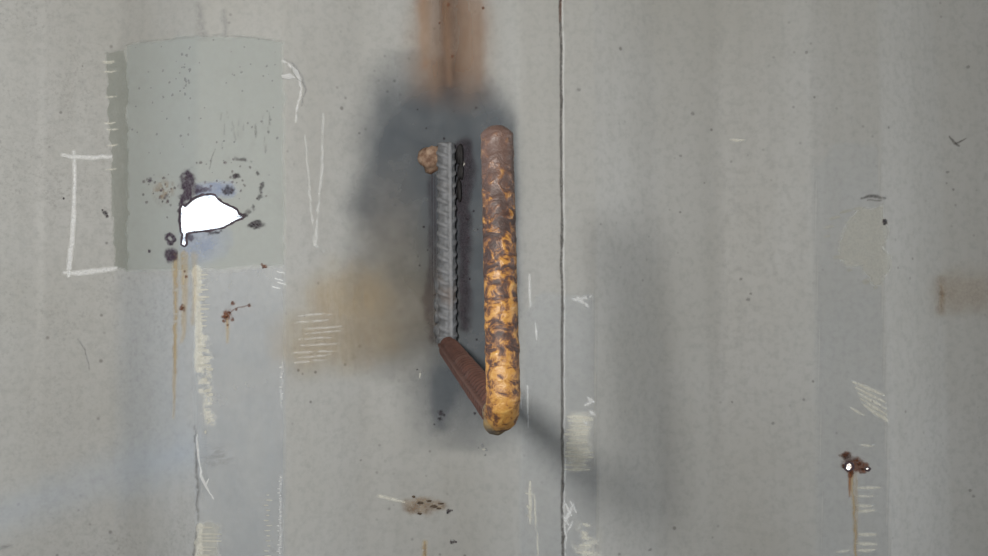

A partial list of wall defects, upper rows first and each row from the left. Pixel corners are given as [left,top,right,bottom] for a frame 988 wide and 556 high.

corrosion [429,0,484,83]
corrosion [379,495,453,515]
corrosion [842,452,868,514]